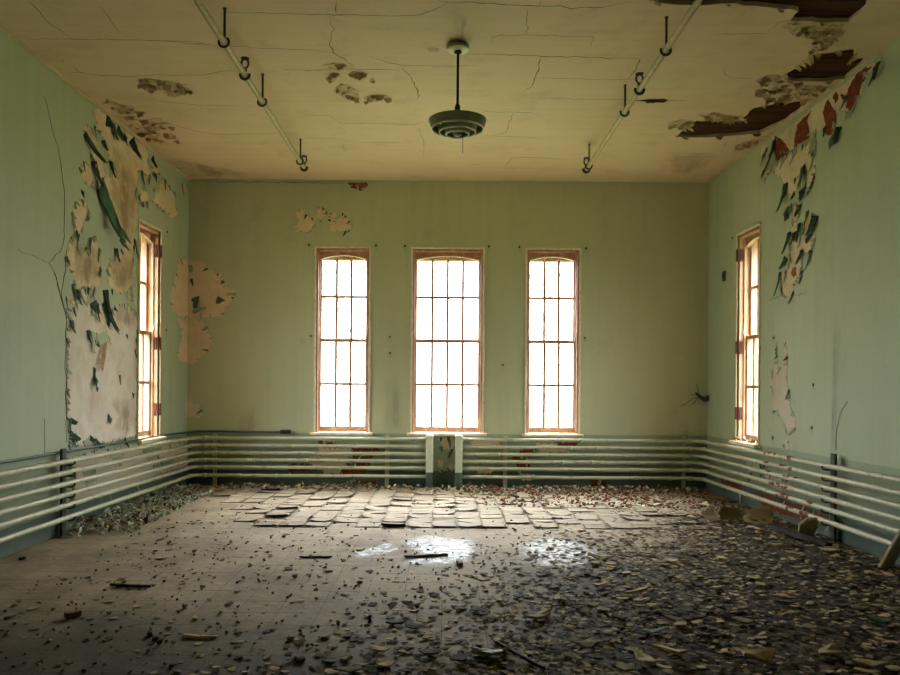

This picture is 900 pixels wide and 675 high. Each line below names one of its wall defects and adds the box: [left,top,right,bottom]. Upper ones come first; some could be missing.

peeling [136,78,193,98]
peeling [323,63,392,105]
crack [147,0,642,100]
peeling [668,112,748,140]
peeling [733,22,884,303]
peeling [291,207,353,236]
crack [18,96,67,454]
peeling [65,99,189,501]
peeling [170,259,237,365]
peeling [769,342,797,451]